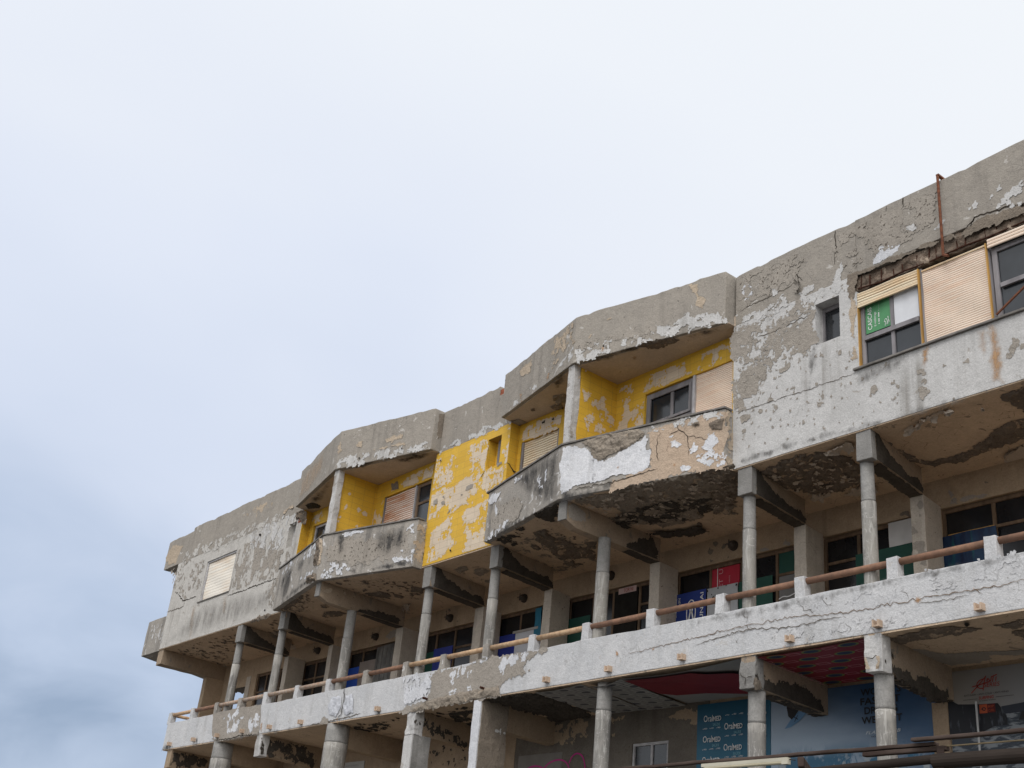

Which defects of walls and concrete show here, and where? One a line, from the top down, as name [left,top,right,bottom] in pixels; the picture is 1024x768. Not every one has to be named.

flaking render [166,180,1024,636]
crack [575,424,707,490]
corrosion [992,332,1001,378]
crack [623,579,1024,659]
peeling [830,580,1024,704]
flaking render [354,646,591,767]